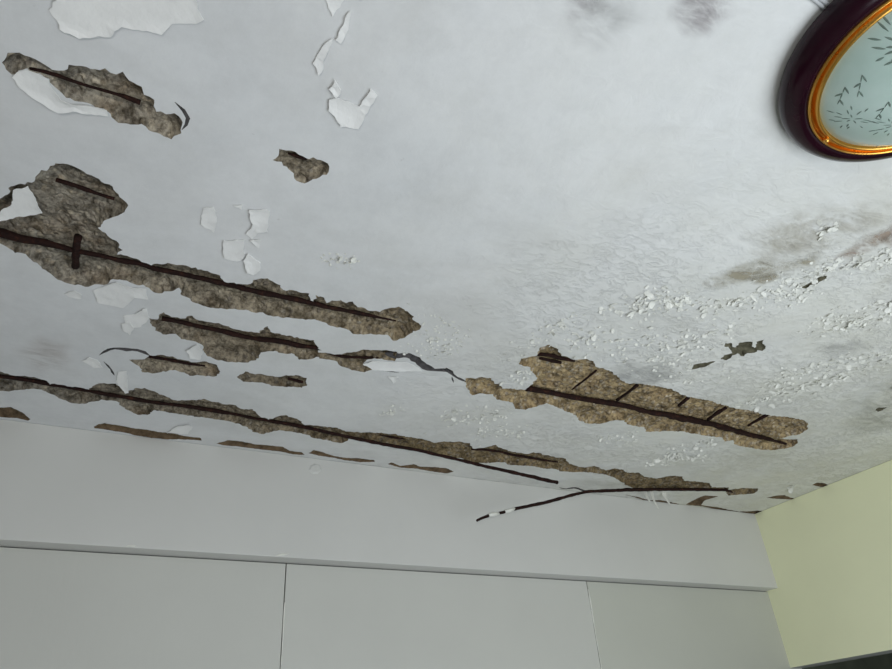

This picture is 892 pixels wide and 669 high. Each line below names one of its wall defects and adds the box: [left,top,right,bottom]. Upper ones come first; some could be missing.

peeling [49,0,204,39]
peeling [313,0,351,76]
spalling [2,53,183,139]
peeling [329,81,377,129]
spalling [274,149,329,183]
water stain [729,263,776,283]
spalling [0,163,892,514]